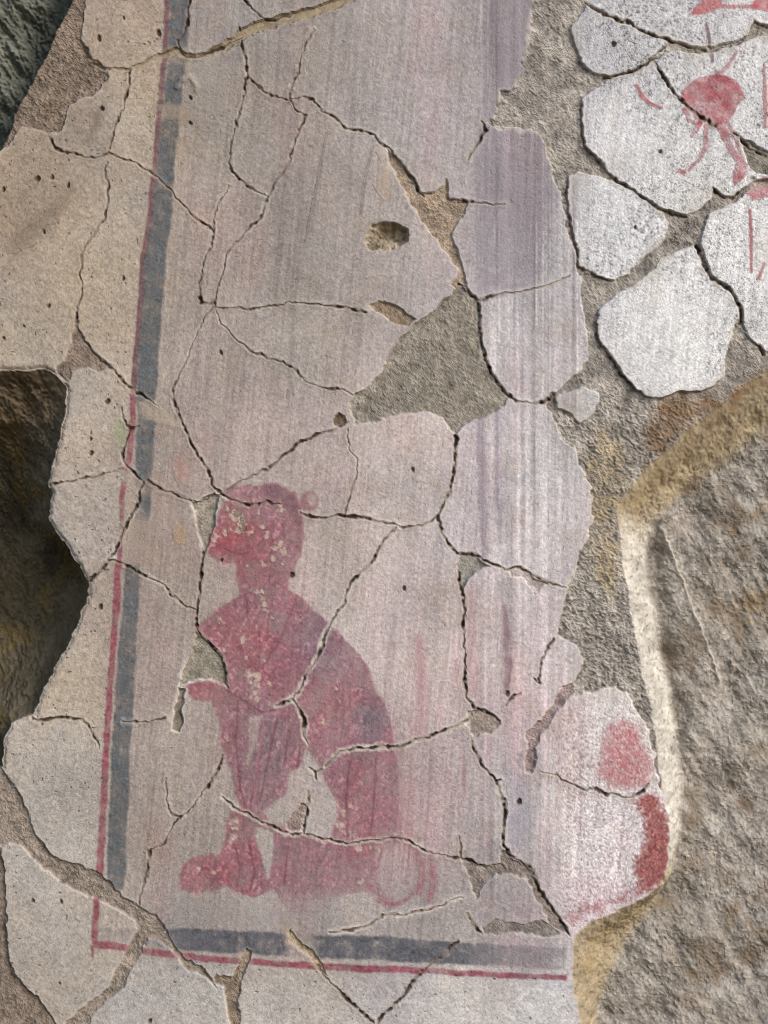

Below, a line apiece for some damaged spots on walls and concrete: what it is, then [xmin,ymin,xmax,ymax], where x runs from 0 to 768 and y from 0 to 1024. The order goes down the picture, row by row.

spalling [3,0,109,148]
spalling [333,151,508,435]
crack [457,182,613,406]
spalling [487,0,768,497]
spalling [193,495,295,578]
crack [49,0,571,937]
crack [31,717,100,750]
spalling [0,768,252,1024]
spalling [172,633,227,733]
crack [317,897,483,1024]
spalling [525,508,662,792]
crack [541,772,649,800]